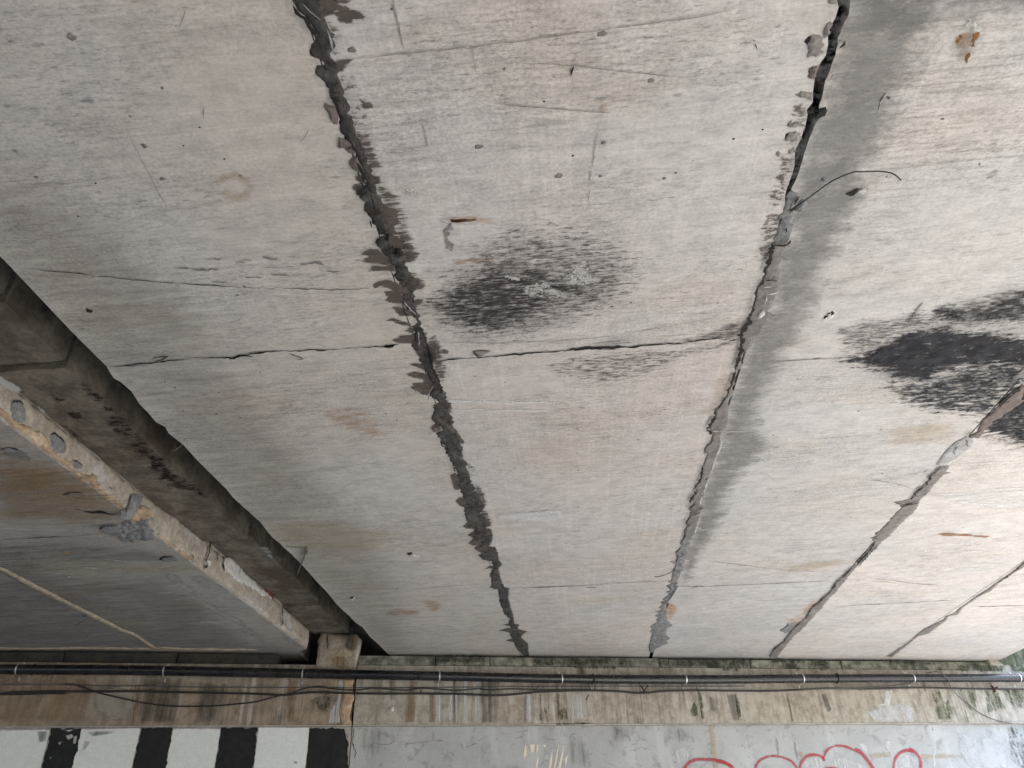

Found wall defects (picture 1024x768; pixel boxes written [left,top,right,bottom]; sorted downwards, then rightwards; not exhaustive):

crack [293,6,317,39]
spalling [0,408,124,508]
crack [116,133,1024,655]
water stain [686,0,934,579]